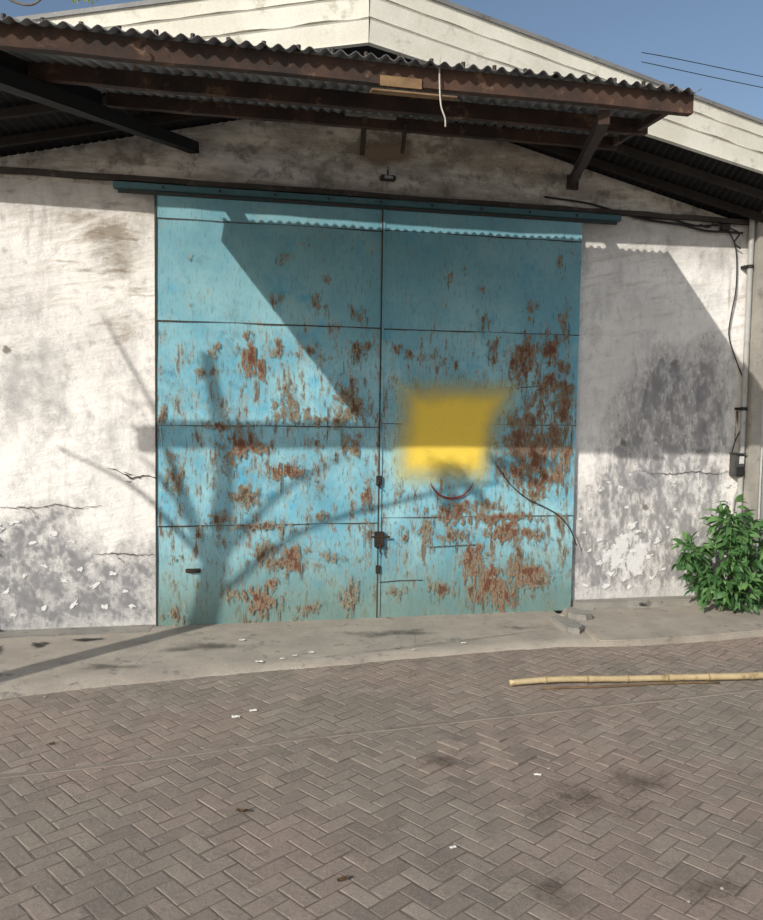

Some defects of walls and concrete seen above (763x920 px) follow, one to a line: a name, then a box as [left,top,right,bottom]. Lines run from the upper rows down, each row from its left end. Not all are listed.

rust [392,342,417,360]
crack [1,503,101,518]
water stain [0,506,154,630]
crack [98,552,152,566]
crack [109,468,155,483]
rust [157,403,188,501]
rust [195,421,362,623]
rust [206,305,382,558]
rust [396,296,578,614]
peeling [587,521,666,590]
water stain [571,344,728,594]
crack [648,463,728,475]